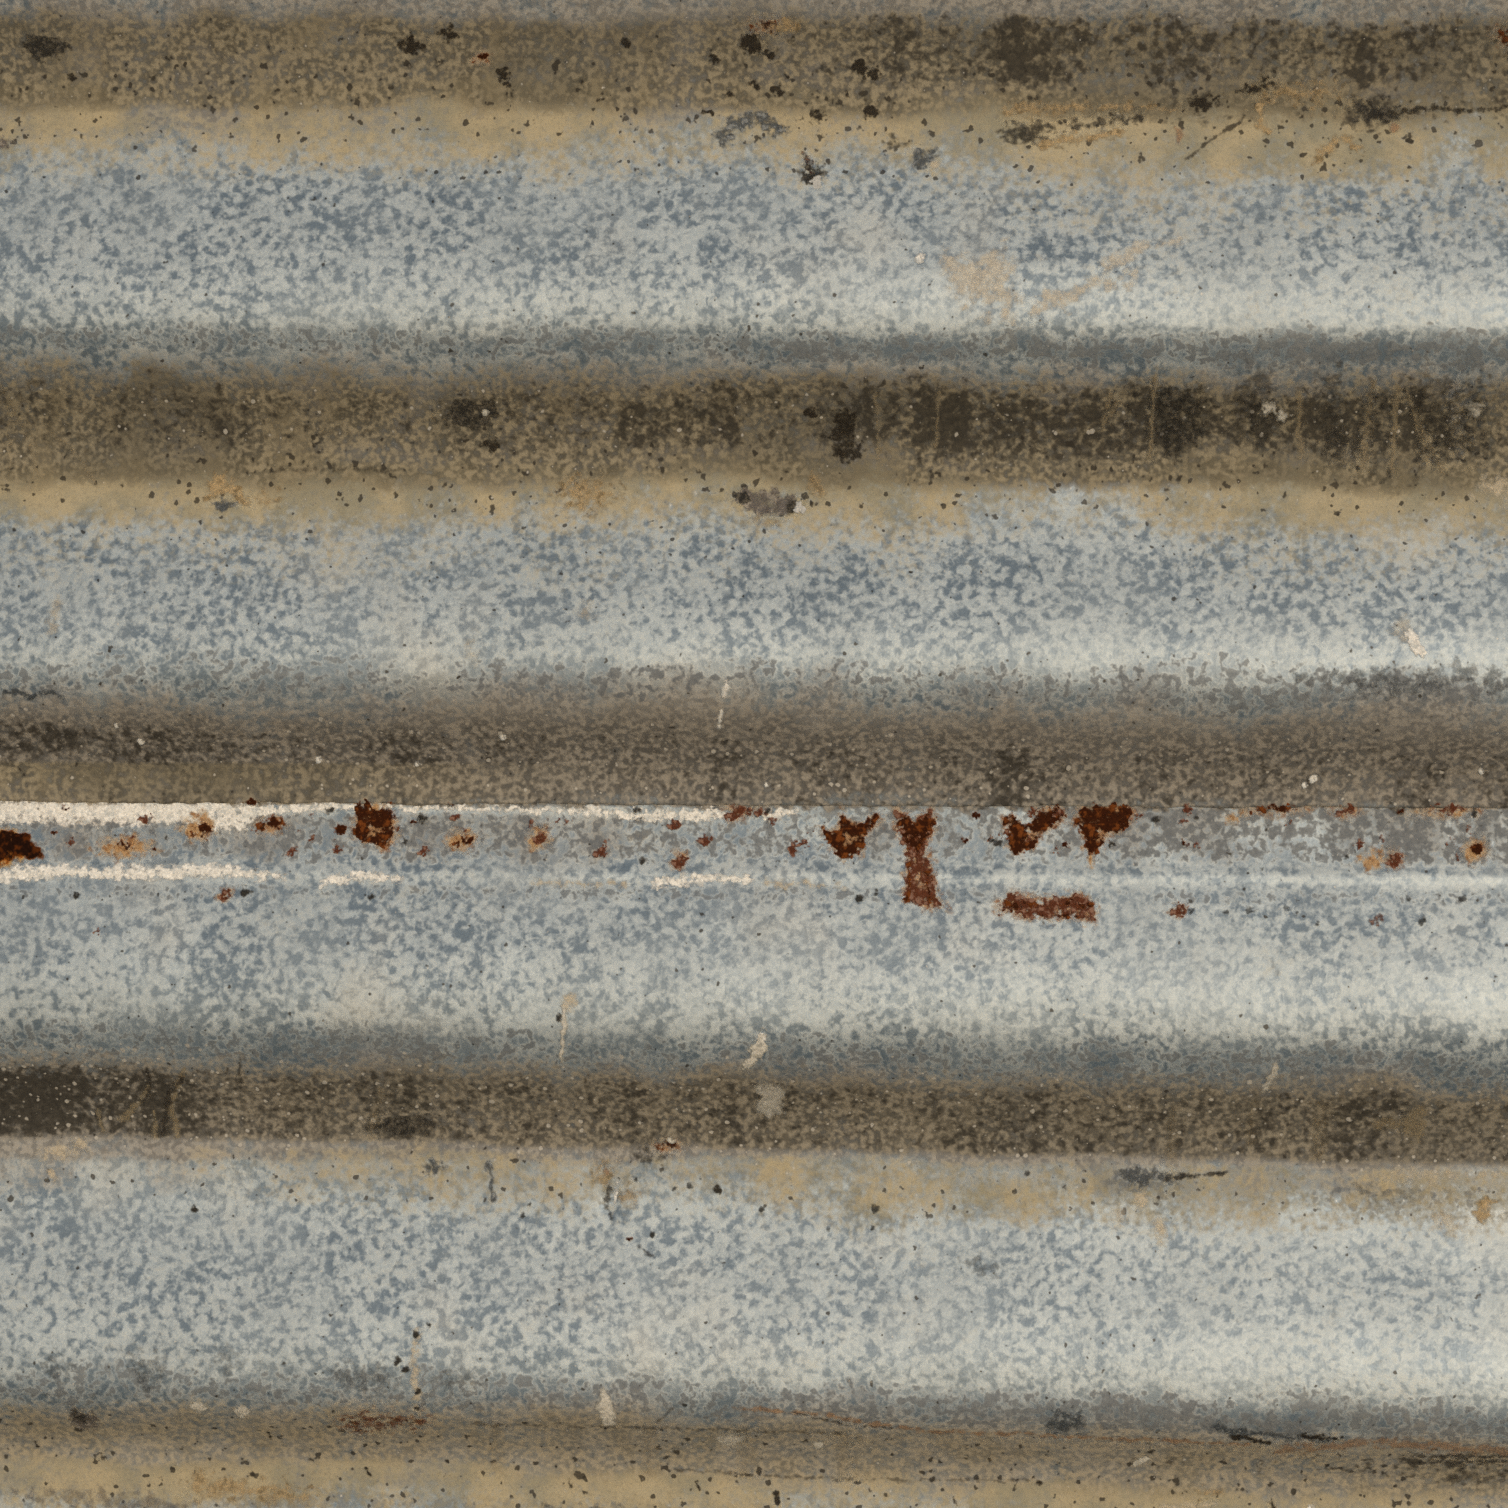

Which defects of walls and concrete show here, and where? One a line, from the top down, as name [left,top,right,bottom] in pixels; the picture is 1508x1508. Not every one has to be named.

corrosion [0,797,811,902]
corrosion [787,807,942,911]
corrosion [987,802,1161,869]
corrosion [1179,803,1201,848]
corrosion [993,892,1096,922]
corrosion [1167,901,1194,918]